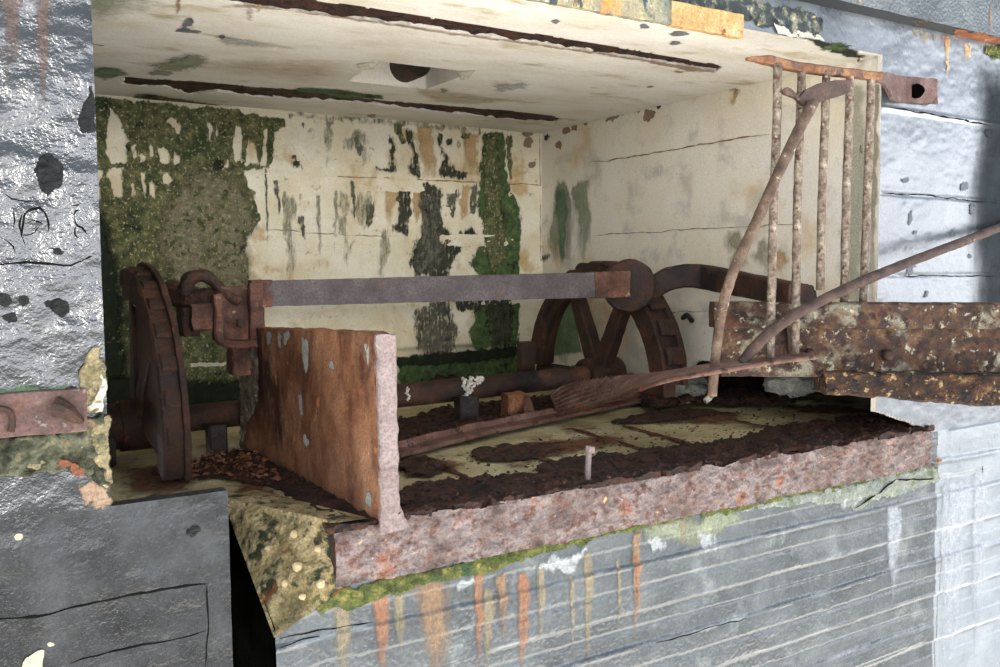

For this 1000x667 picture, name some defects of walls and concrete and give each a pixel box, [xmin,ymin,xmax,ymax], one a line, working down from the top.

peeling [673,0,825,42]
leakage [418,122,481,168]
crack [0,194,92,266]
leakage [380,182,478,276]
leakage [414,301,486,354]
spalling [0,346,113,509]
rust [397,384,913,514]
crack [854,478,944,509]
crack [0,584,209,667]
rust [375,595,404,650]
rust [420,582,445,661]
rust [475,567,546,654]